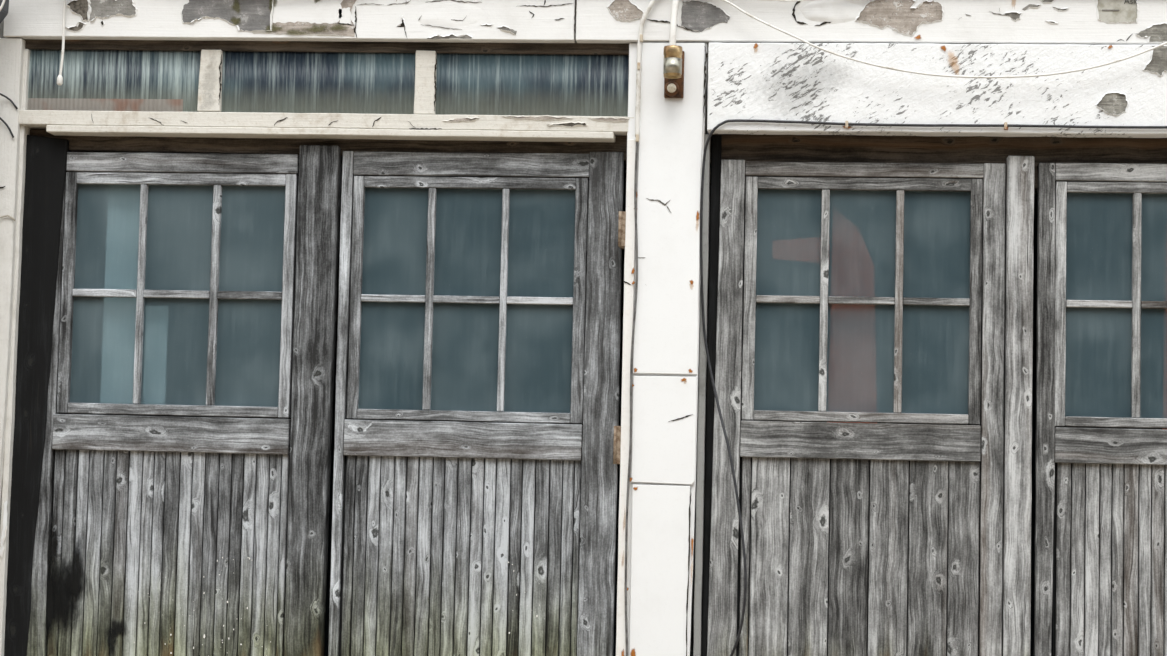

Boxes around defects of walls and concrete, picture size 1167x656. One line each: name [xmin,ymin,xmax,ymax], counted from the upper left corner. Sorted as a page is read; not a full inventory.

peeling [65,0,138,33]
peeling [181,0,356,37]
peeling [607,0,730,32]
peeling [855,0,944,37]
peeling [1096,0,1167,77]
peeling [1095,91,1129,117]